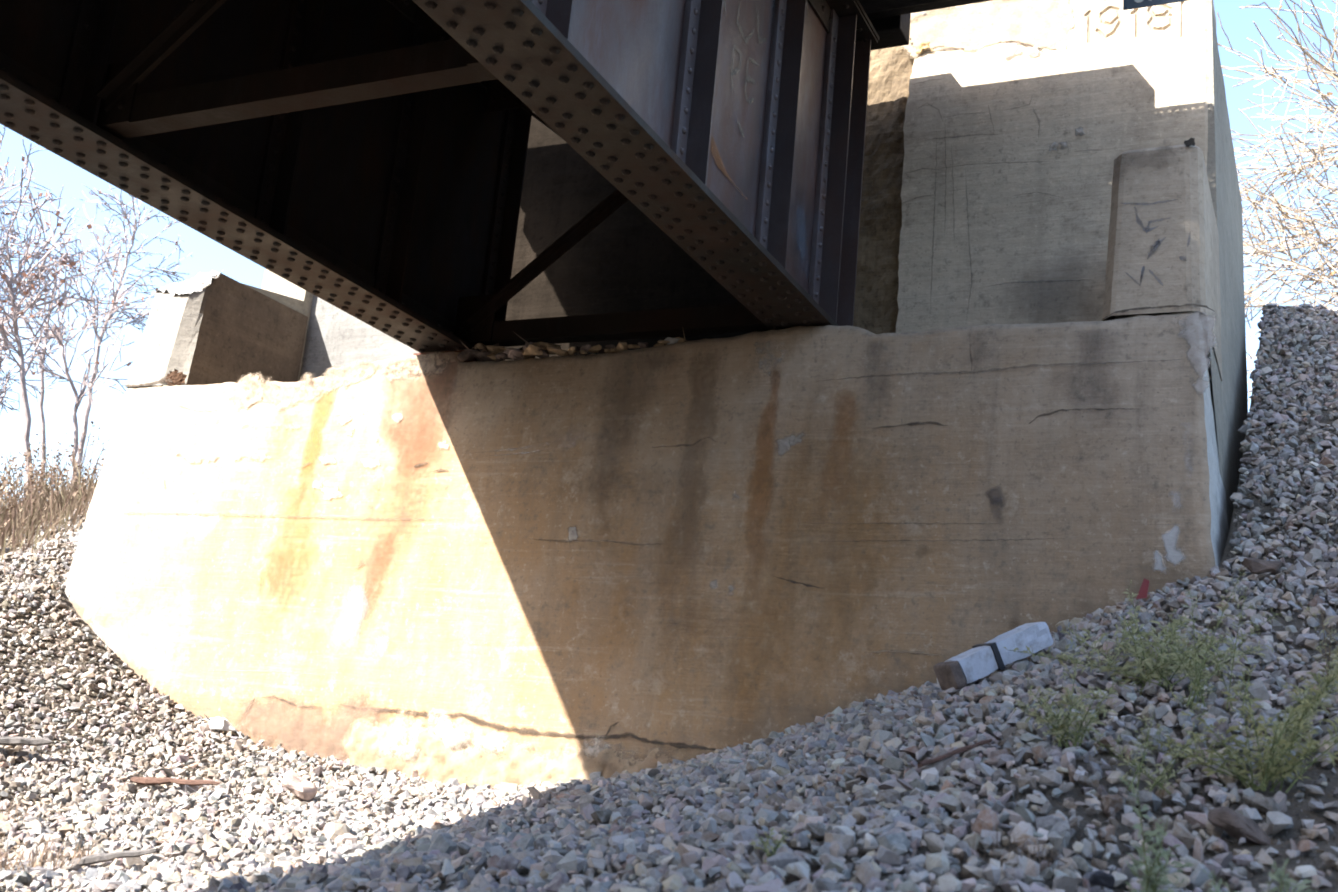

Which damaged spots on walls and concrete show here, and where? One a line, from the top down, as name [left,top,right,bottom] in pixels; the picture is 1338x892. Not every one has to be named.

crack [909,38,1044,54]
spalling [230,351,448,412]
corrosion [303,388,335,478]
crack [877,421,948,429]
crack [1029,408,1124,424]
crack [242,696,716,750]